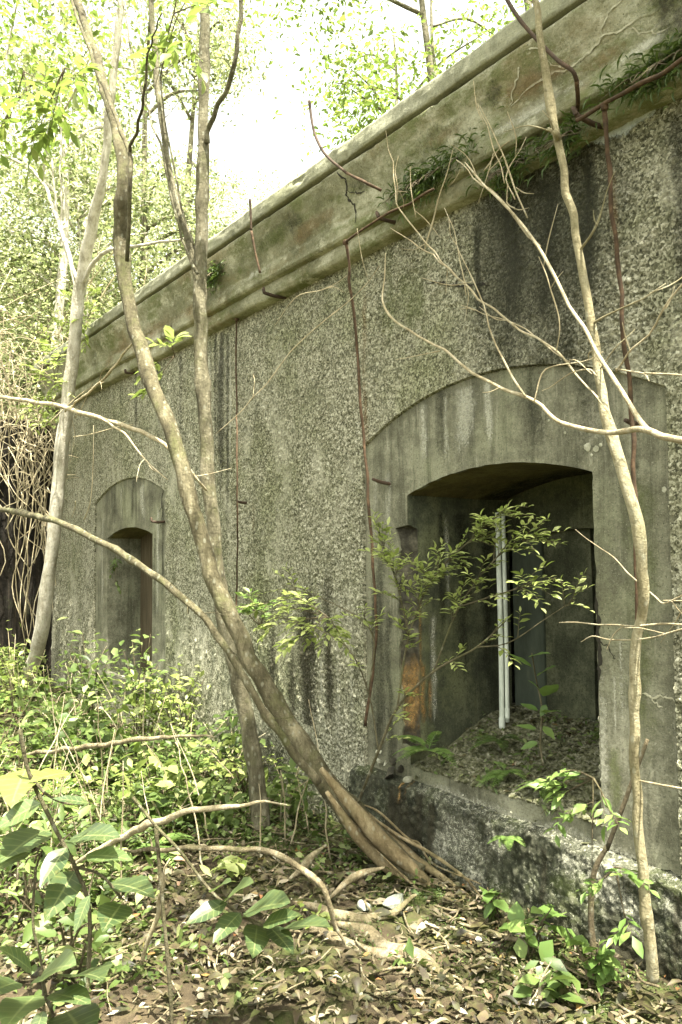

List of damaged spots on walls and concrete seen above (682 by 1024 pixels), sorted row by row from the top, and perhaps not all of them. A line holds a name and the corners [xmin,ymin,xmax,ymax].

crack [337,172,365,221]
damp [209,333,231,496]
damp [421,389,473,452]
damp [480,470,592,500]
damp [269,635,296,715]
damp [311,578,351,719]